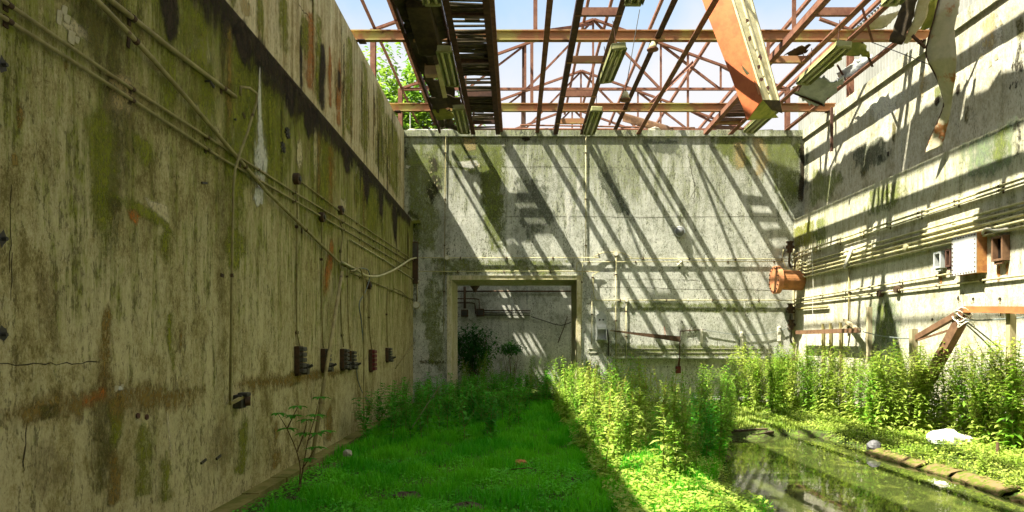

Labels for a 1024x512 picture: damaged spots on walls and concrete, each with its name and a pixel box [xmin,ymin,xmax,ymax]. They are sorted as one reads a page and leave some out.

leakage [76,0,172,259]
leakage [159,0,418,273]
rust [328,47,341,126]
crack [0,359,97,367]
leakage [3,305,206,506]
leakage [238,369,343,395]